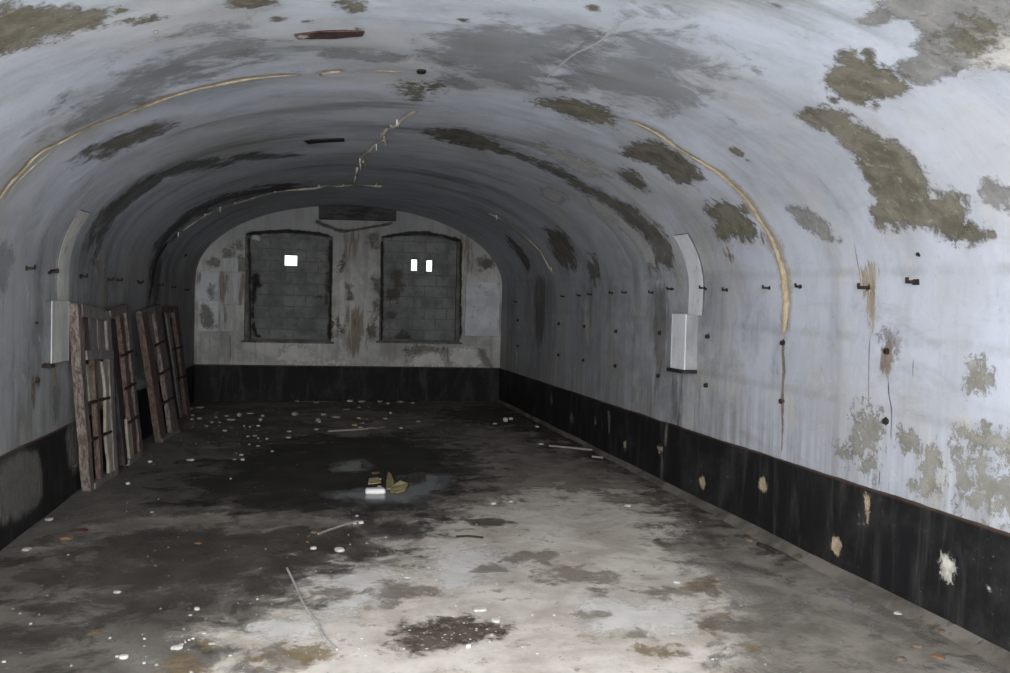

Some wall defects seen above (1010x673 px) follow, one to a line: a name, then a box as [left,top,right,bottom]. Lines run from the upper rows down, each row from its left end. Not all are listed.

crack [0,71,344,199]
crack [149,111,417,300]
leakage [423,127,675,272]
peeling [528,97,625,130]
spalling [619,139,705,192]
spalling [796,0,1010,248]
leakage [331,277,396,357]
leakage [541,226,600,285]
crack [629,120,790,451]
corrosion [859,263,879,333]
corrosion [880,341,895,374]
spalling [939,550,957,585]